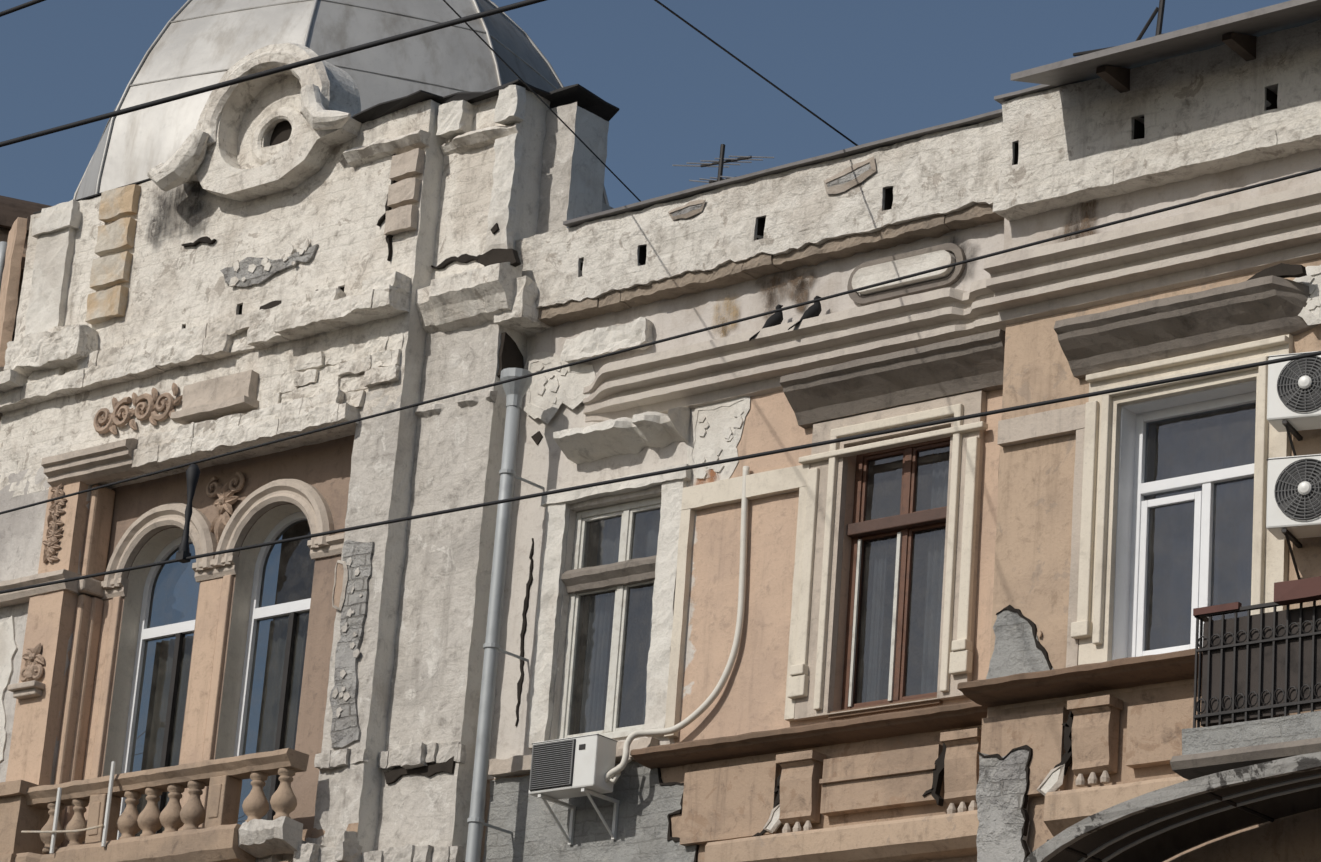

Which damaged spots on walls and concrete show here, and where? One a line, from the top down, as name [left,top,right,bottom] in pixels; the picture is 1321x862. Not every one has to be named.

damp [761,271,813,317]
spalling [1293,265,1321,325]
peeling [687,396,750,481]
crack [515,538,534,726]
spalling [986,605,1053,679]
spalling [976,745,1065,862]